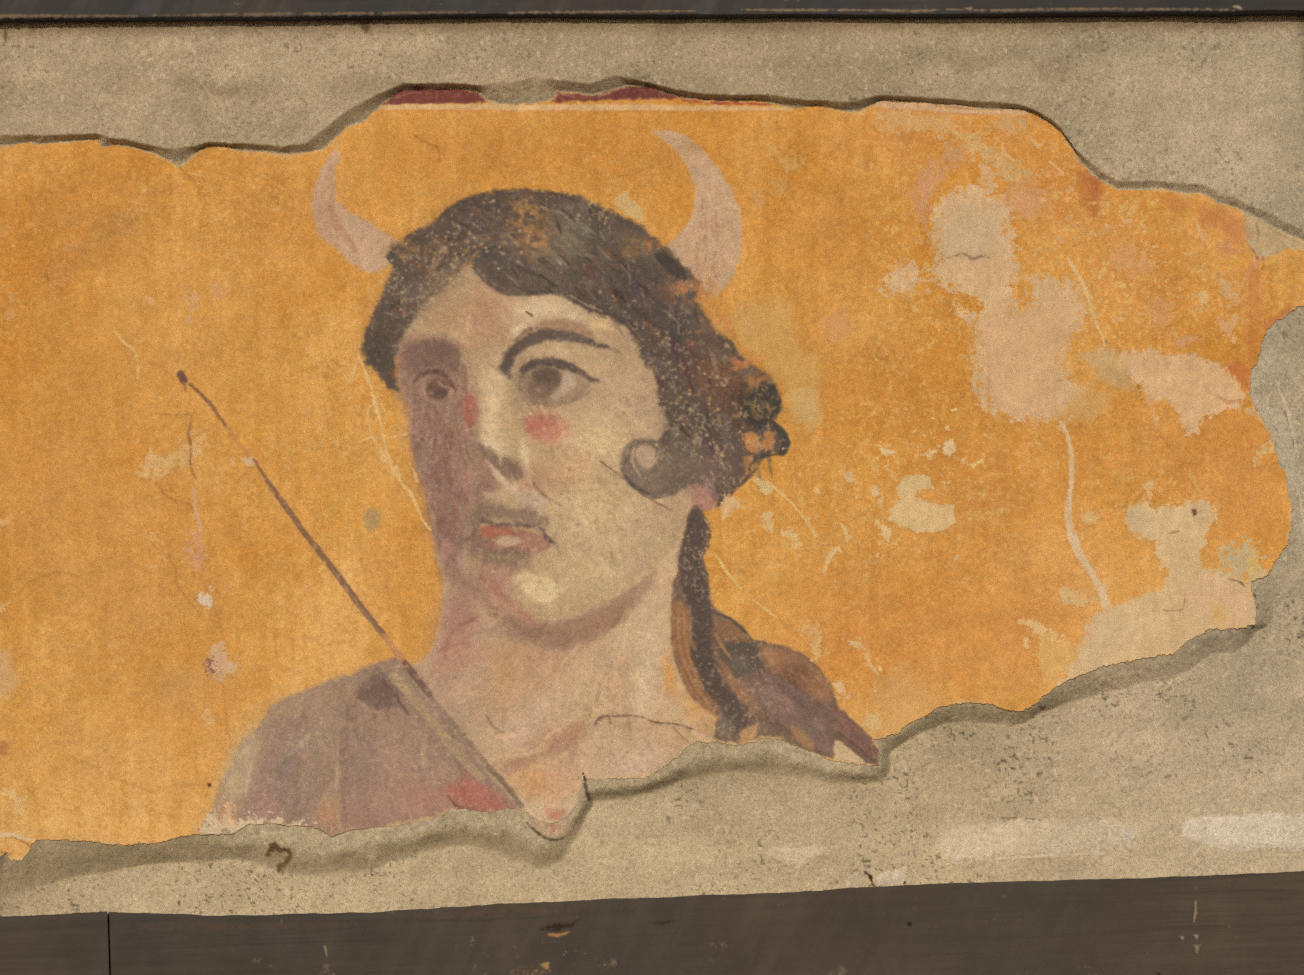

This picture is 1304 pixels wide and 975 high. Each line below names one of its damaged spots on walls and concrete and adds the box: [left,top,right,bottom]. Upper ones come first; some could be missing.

peeling [753,105,1259,575]
peeling [717,492,744,522]
crack [1058,420,1112,609]
peeling [1017,479,1269,690]